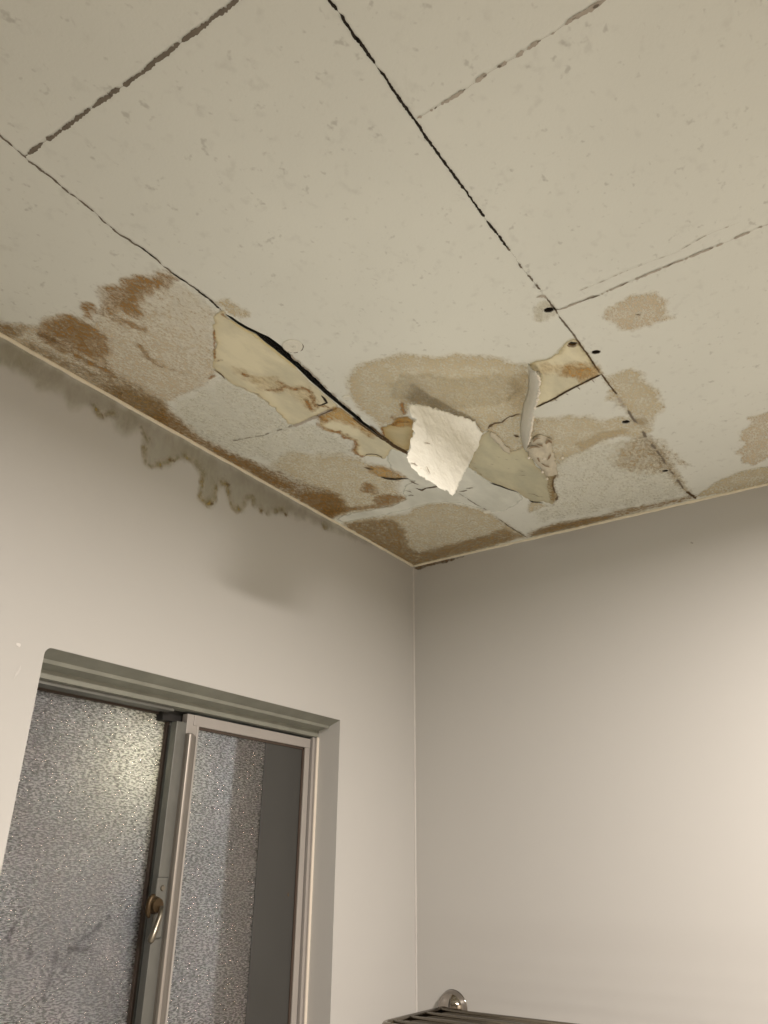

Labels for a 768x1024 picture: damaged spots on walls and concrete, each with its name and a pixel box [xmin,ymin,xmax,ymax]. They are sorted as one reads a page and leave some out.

crack [0,0,239,310]
crack [328,0,768,499]
water stain [0,273,213,421]
crack [234,409,333,441]
peeling [209,311,558,522]
water stain [350,354,664,460]
peeling [530,340,600,407]
water stain [278,453,522,565]